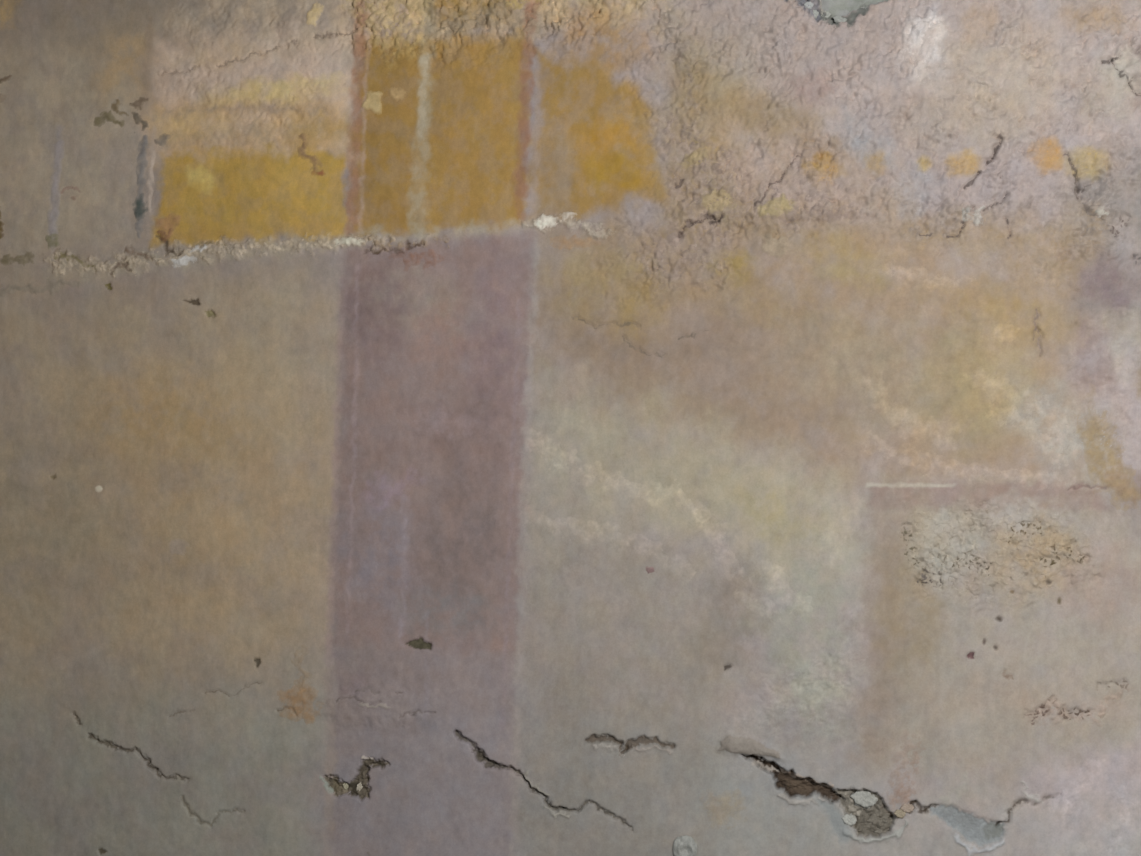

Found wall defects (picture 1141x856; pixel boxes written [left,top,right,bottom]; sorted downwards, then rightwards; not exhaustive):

spalling [783,0,889,30]
damp [0,251,35,266]
spalling [40,231,451,291]
spalling [519,100,876,297]
peeling [1067,169,1141,266]
spalling [894,492,1105,622]
spalling [967,637,999,660]
crack [72,712,245,828]
spalling [319,755,390,802]
crack [454,730,633,831]
crack [584,734,676,758]
spalling [718,735,1007,856]